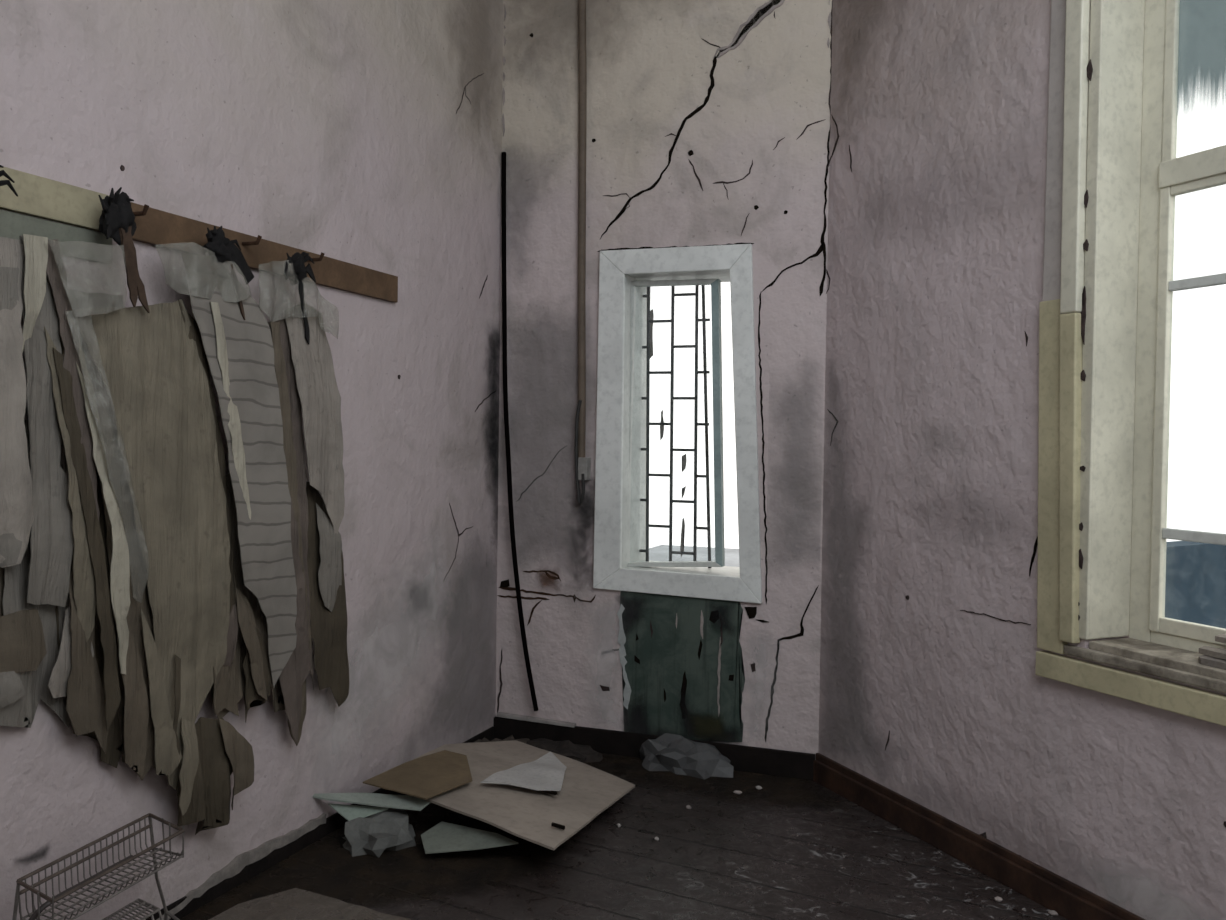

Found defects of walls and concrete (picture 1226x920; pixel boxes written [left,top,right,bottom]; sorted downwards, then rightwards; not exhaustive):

peeling [600,591,757,742]
crack [597,0,852,742]